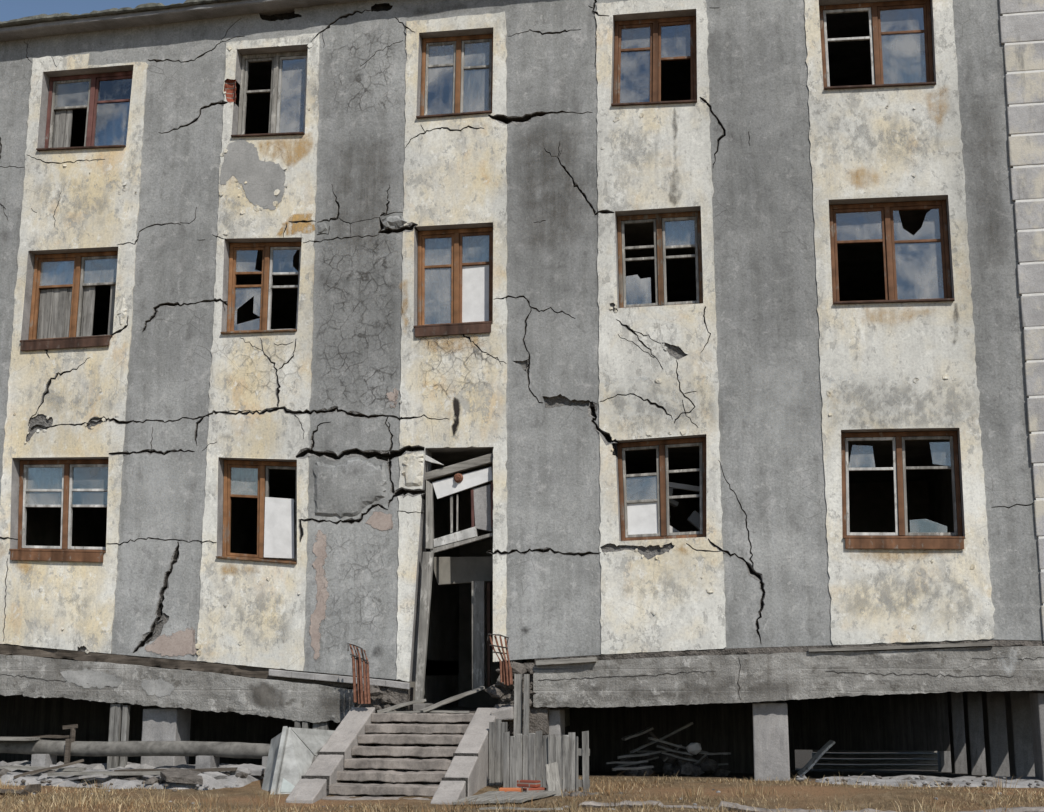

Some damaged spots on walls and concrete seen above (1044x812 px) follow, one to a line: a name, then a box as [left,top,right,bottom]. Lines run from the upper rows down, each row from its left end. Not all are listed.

crack [0,137,105,168]
spalling [224,79,236,103]
peeling [219,139,288,235]
crack [405,110,593,148]
crack [544,141,614,215]
crack [700,97,750,167]
spalling [24,414,53,444]
crack [28,184,448,542]
crack [426,295,575,403]
crack [588,319,698,445]
crack [107,537,217,653]
crack [686,460,766,643]